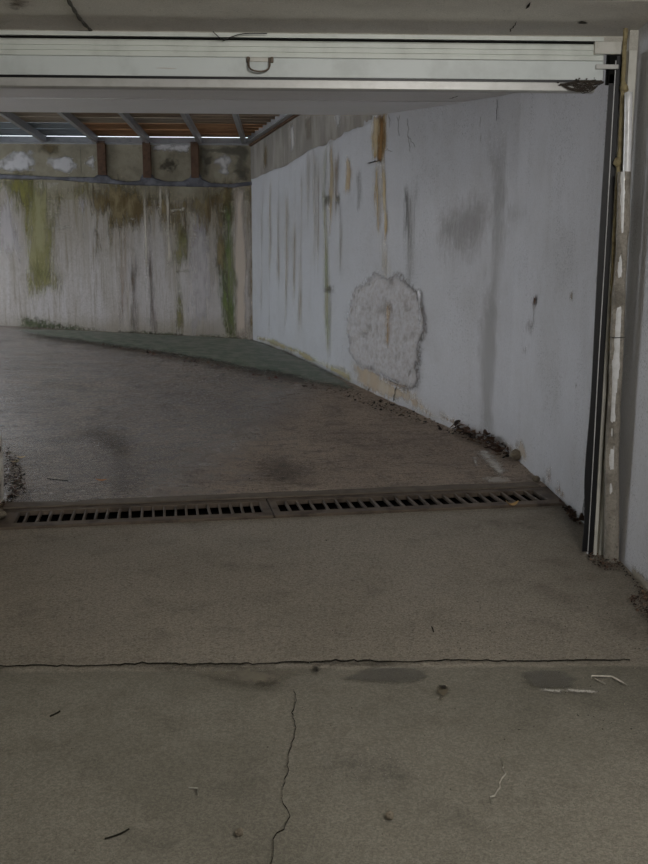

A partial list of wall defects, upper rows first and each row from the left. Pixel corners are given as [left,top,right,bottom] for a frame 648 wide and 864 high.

water stain [0,151,34,171]
water stain [41,145,94,172]
water stain [16,181,68,296]
water stain [89,145,315,361]
water stain [324,151,339,346]
crack [0,659,630,668]
crack [271,692,296,863]